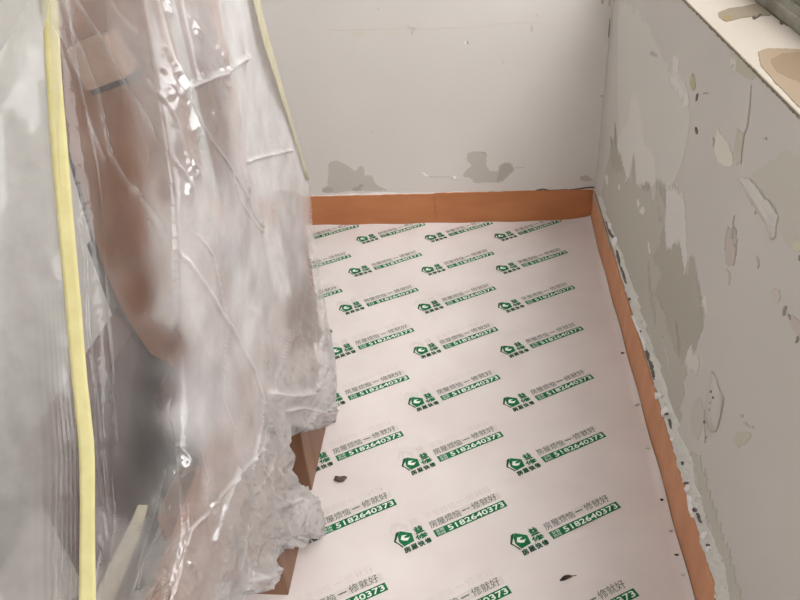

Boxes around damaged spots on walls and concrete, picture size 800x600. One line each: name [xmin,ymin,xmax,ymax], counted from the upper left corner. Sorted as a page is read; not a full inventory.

water stain [758,48,800,107]
peeling [323,160,387,193]
peeling [453,151,514,183]
peeling [596,150,730,600]